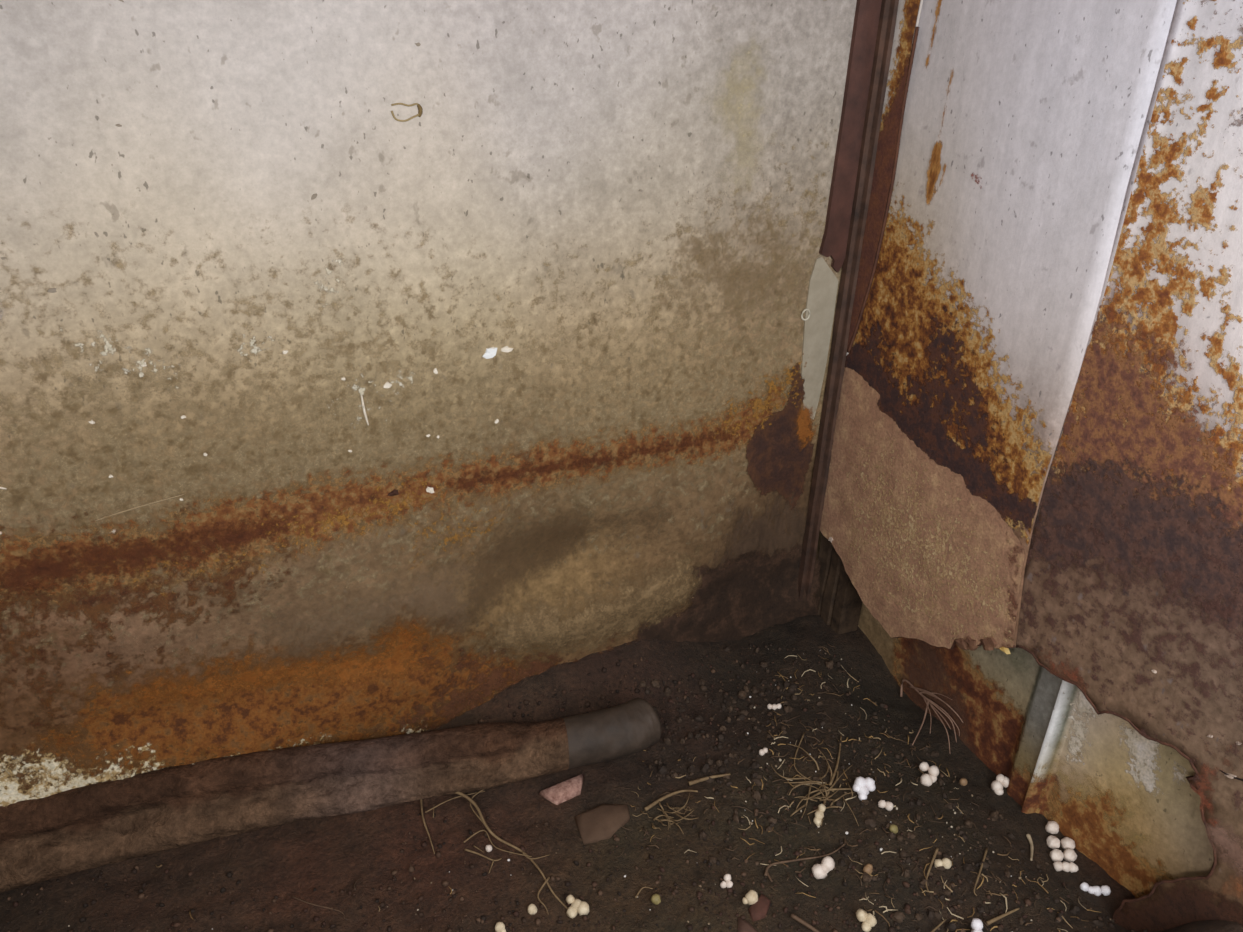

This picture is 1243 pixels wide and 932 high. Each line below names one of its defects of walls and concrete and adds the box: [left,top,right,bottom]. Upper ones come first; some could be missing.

efflorescence [0,742,164,807]
rust [0,353,816,787]
rust [845,0,1243,898]